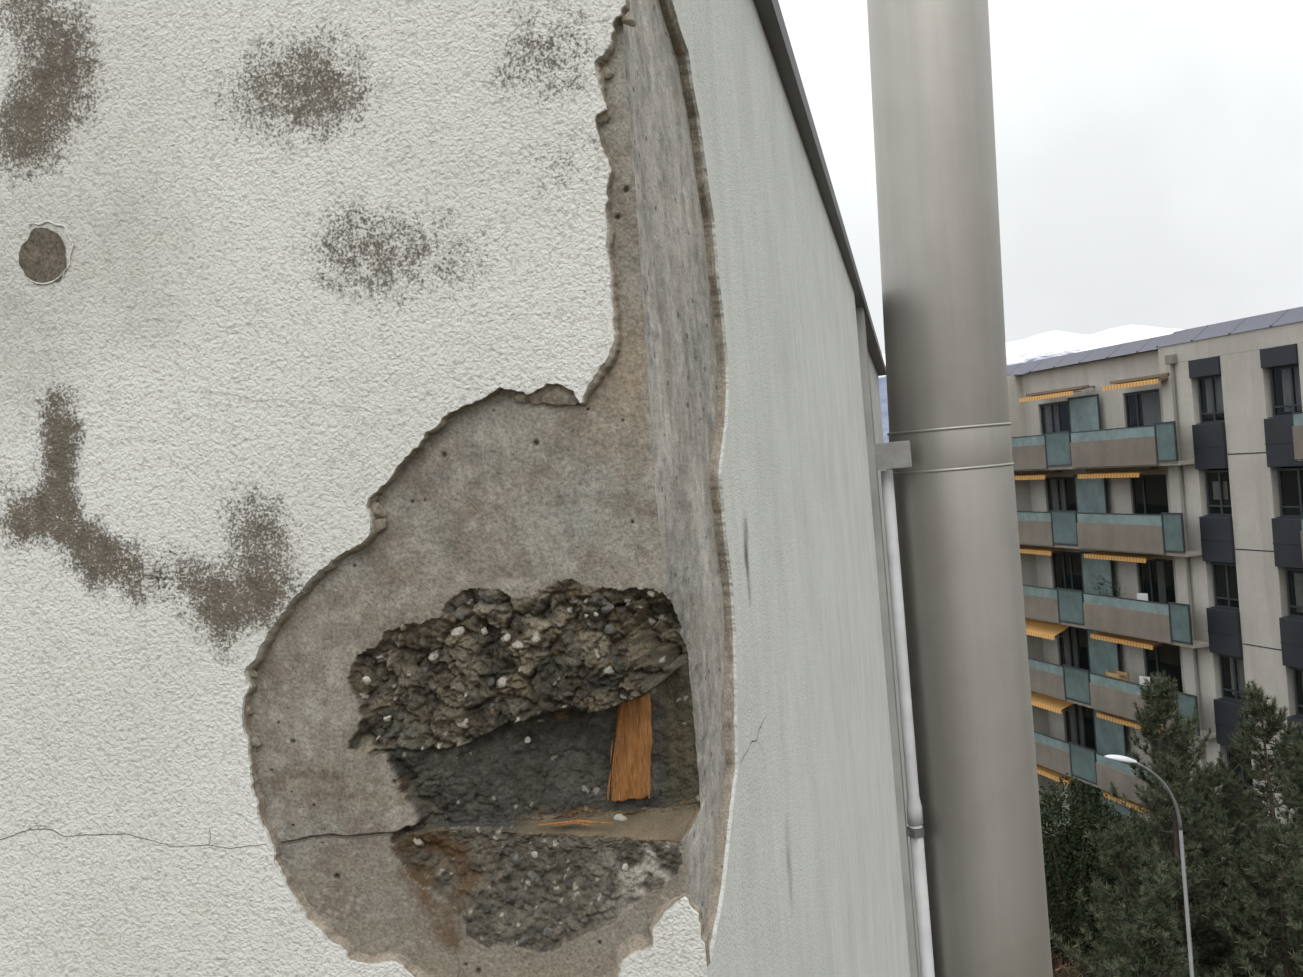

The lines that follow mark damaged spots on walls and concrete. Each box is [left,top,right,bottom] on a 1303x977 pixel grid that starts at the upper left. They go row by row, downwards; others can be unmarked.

leakage [0,0,104,188]
leakage [218,22,372,146]
mould [494,0,600,98]
peeling [18,220,74,285]
leakage [307,204,488,304]
leakage [0,382,304,661]
spalling [244,0,735,977]
crack [0,825,393,849]